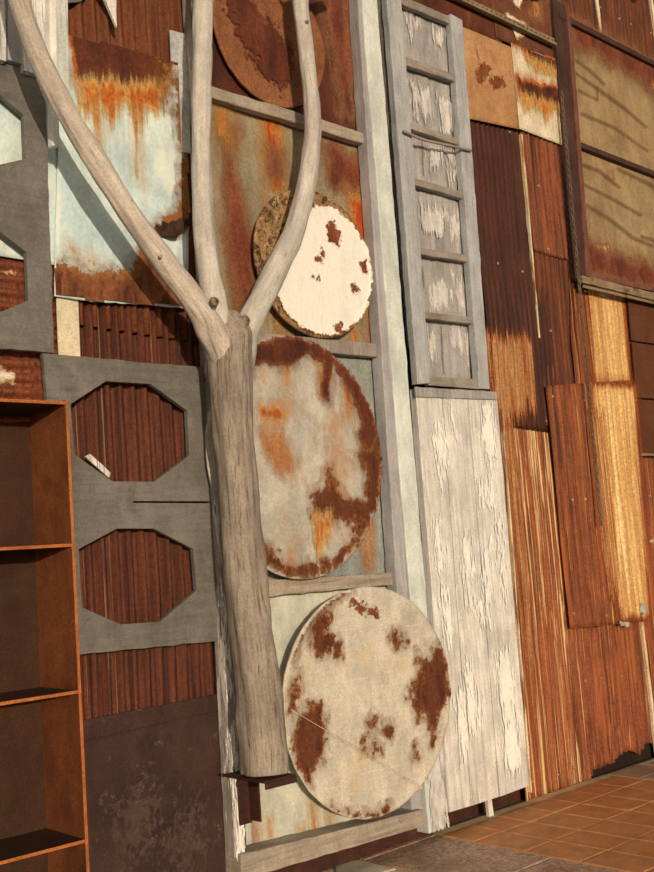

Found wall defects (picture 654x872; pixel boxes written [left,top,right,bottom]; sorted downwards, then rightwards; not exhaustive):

corrosion [68,35,181,179]
corrosion [221,0,295,90]
corrosion [474,43,560,124]
corrosion [155,153,191,233]
corrosion [320,136,364,239]
corrosion [312,219,341,281]
corrosion [588,237,654,287]
corrosion [254,315,383,578]
corrosion [293,593,380,663]
corrosion [288,675,329,784]
corrosion [360,713,395,757]
corrosion [387,629,451,749]